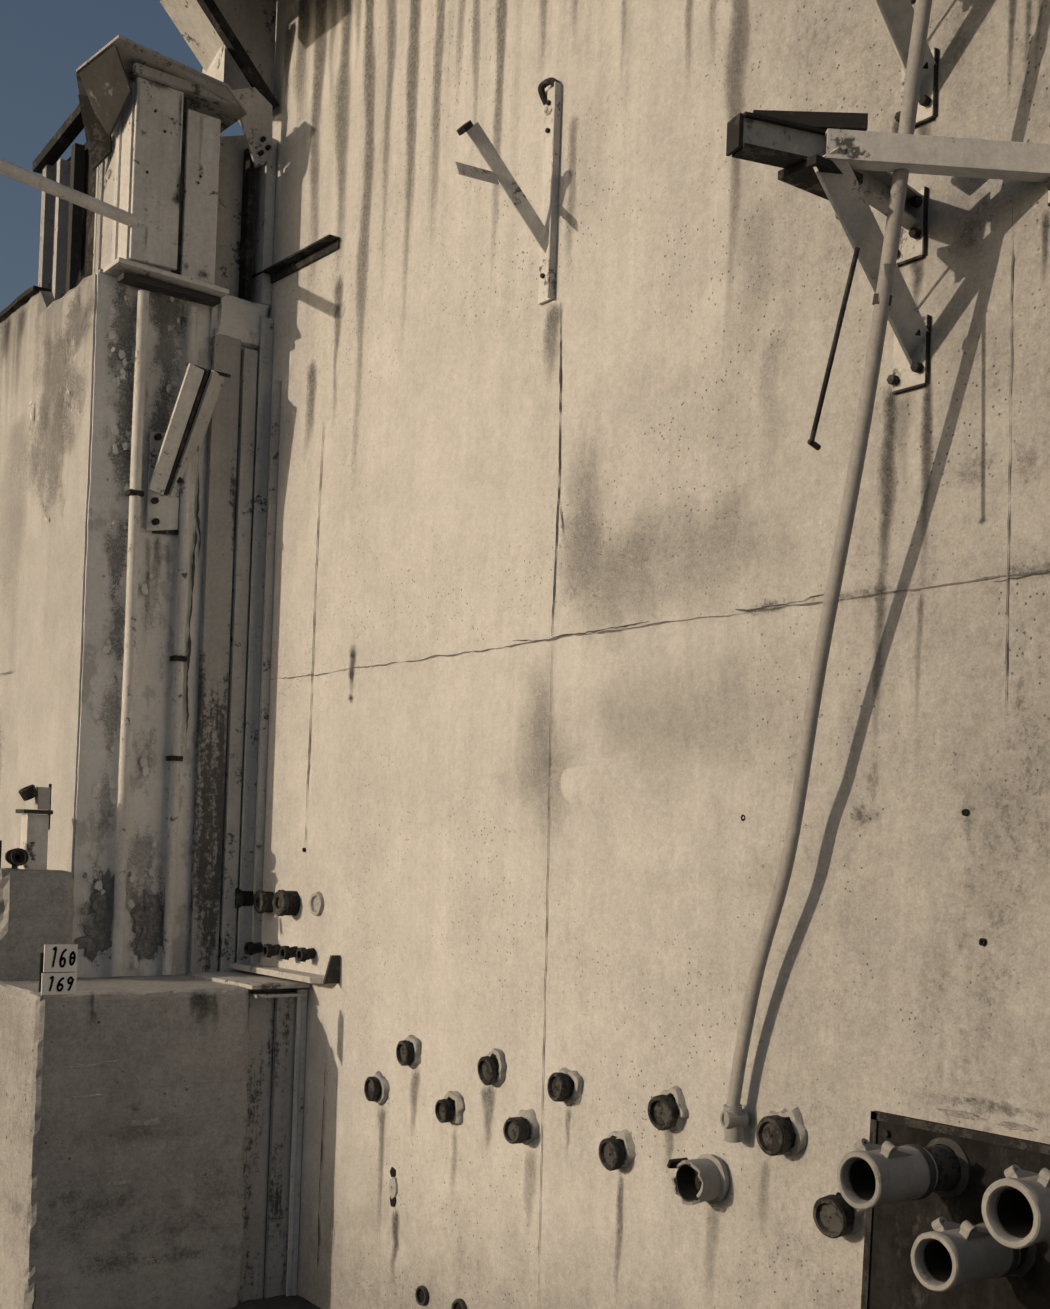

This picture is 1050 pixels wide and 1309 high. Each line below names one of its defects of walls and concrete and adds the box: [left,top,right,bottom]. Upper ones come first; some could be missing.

leakage [286,0,326,196]
leakage [335,0,419,300]
leakage [434,0,444,129]
leakage [494,0,506,146]
leakage [727,0,747,118]
leakage [545,307,558,352]
crack [270,196,1050,1268]